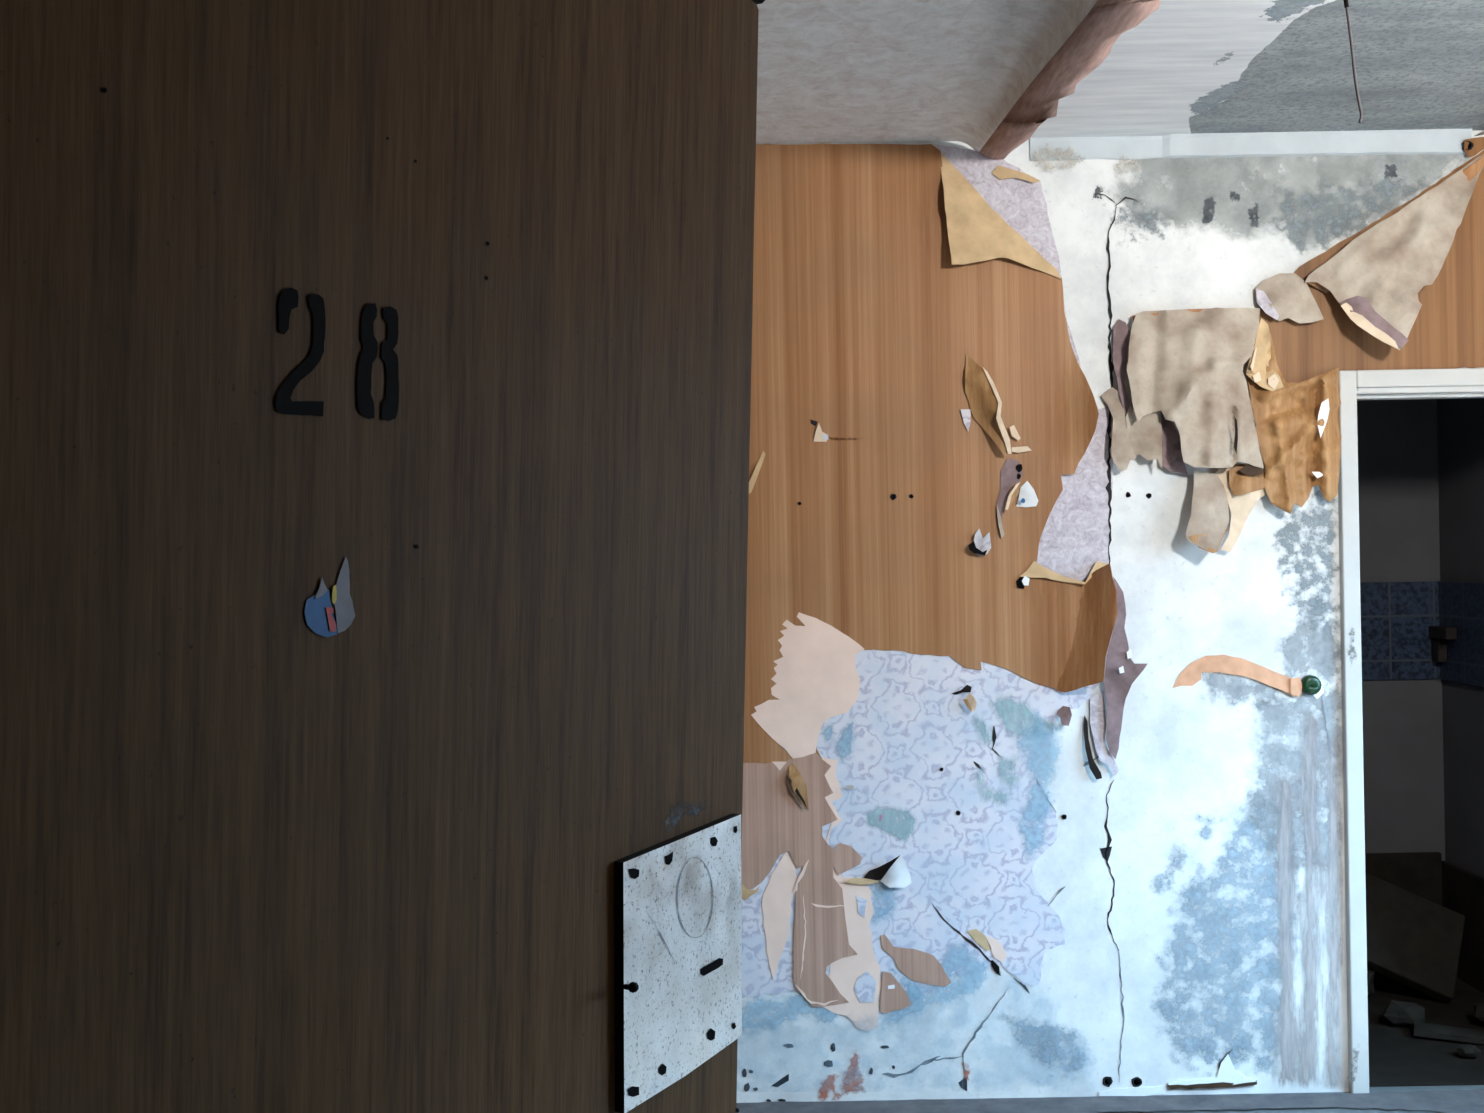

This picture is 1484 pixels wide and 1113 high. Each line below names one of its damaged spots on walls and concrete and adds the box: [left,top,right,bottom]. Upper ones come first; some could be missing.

flaking render [1030,0,1336,138]
peeling [941,153,1061,279]
crack [1098,193,1138,563]
spalling [968,529,991,557]
peeling [1016,561,1107,589]
peeling [1101,141,1484,870]
peeling [1056,691,1119,779]
crack [882,903,1030,1091]
crack [1100,780,1125,1080]
water stain [1155,716,1343,1085]
spalling [742,1069,789,1102]
flaking render [1099,1049,1257,1096]